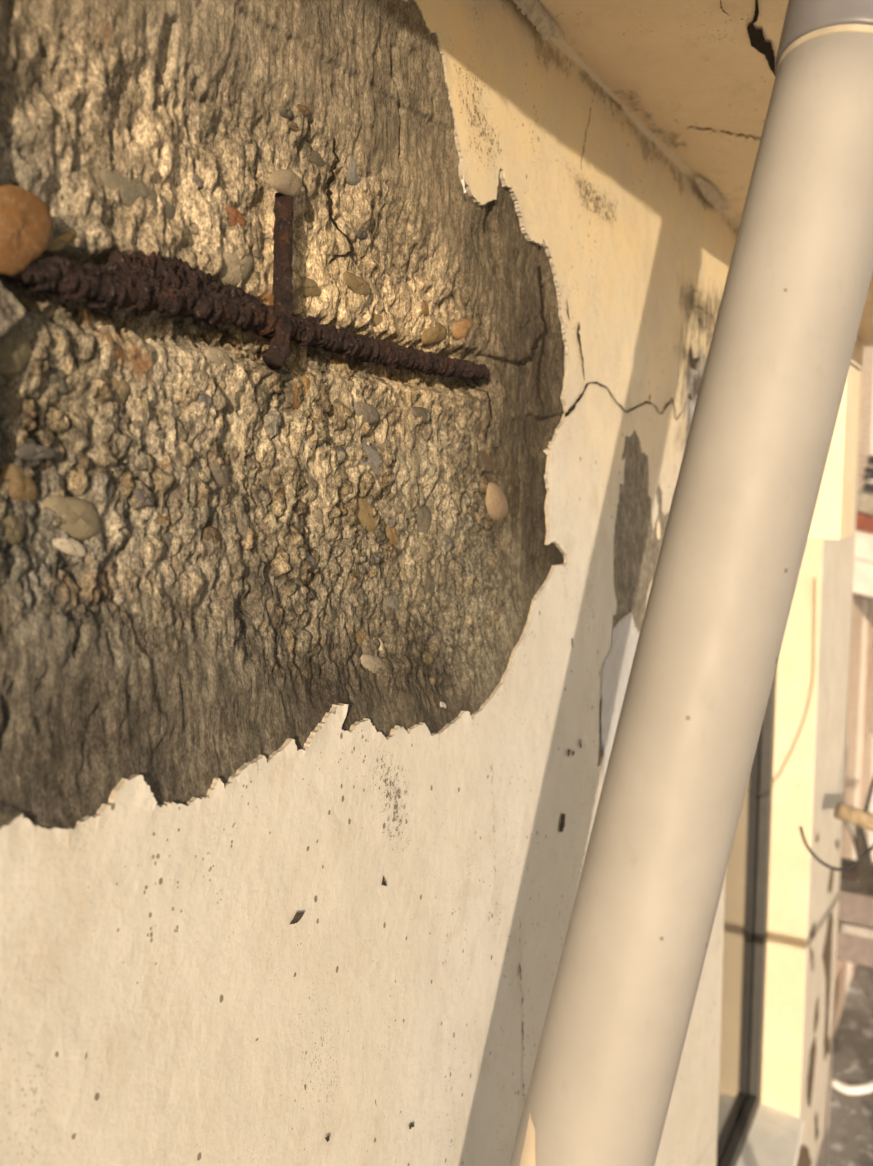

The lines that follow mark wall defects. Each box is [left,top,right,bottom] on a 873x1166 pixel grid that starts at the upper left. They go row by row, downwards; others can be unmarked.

crack [720,0,776,76]
crack [326,137,354,276]
crack [687,126,760,140]
rust [0,192,490,381]
spalling [0,0,565,829]
crack [466,382,492,440]
crack [479,265,682,421]
peeling [597,431,669,782]